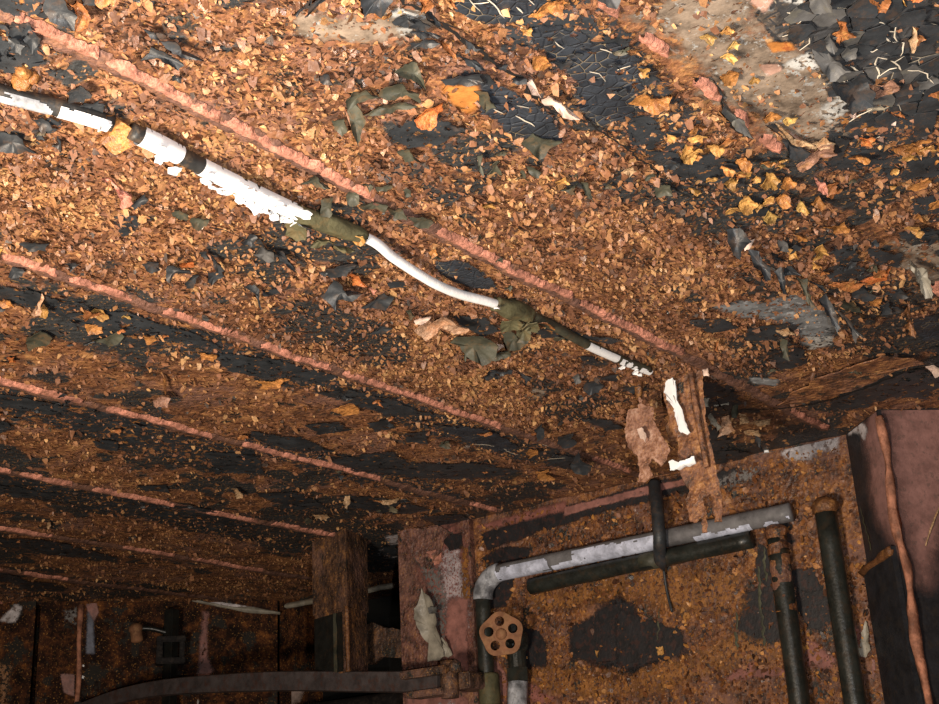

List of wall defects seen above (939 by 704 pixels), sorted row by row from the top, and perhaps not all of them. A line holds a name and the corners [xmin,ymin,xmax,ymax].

corrosion [11,65,41,91]
peeling [0,0,117,78]
corrosion [96,114,136,155]
peeling [293,0,441,49]
peeling [320,61,465,163]
crack [400,0,691,198]
crack [843,22,934,94]
peeling [142,203,410,311]
peeling [621,0,939,465]
corrosion [31,294,48,319]
corrosion [153,372,171,414]
peeling [450,315,623,398]